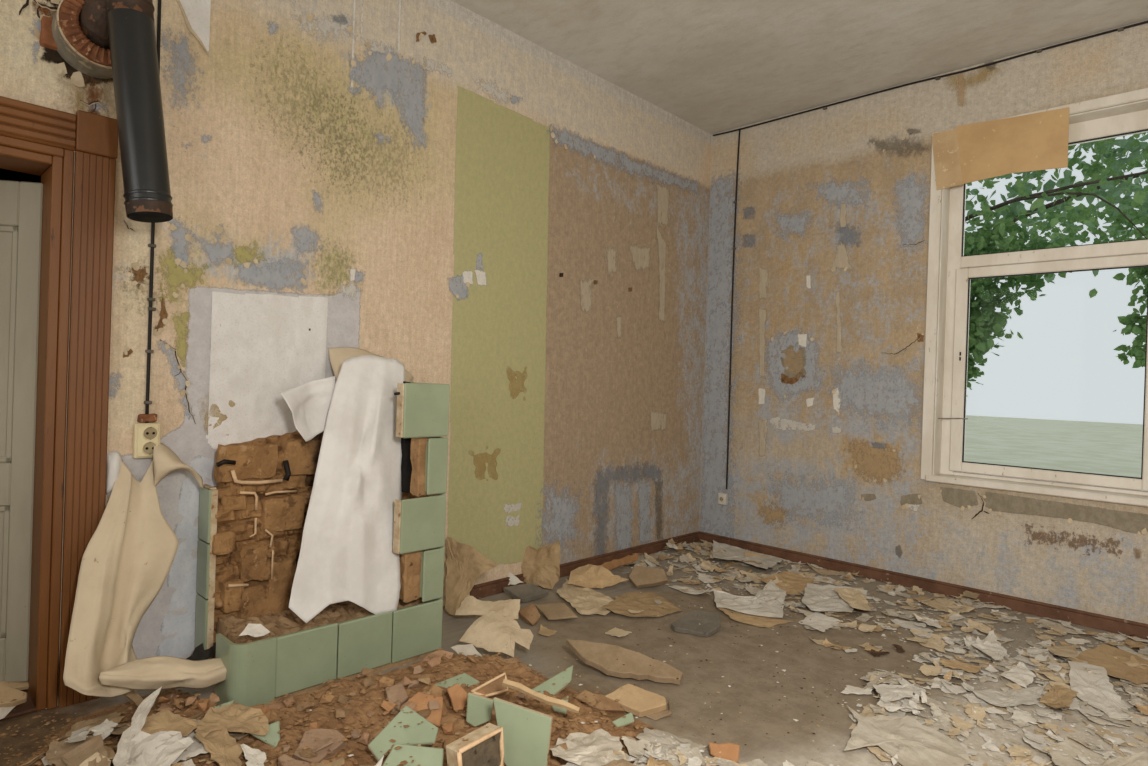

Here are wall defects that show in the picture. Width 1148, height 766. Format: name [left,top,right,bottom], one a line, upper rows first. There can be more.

spalling [416,31,437,43]
peeling [348,46,428,148]
peeling [808,177,869,272]
peeling [550,124,755,538]
peeling [758,268,923,434]
flaking render [121,454,153,482]
flaking render [129,219,365,659]
peeling [849,440,906,501]
spalling [901,494,922,512]
spalling [940,487,1148,535]